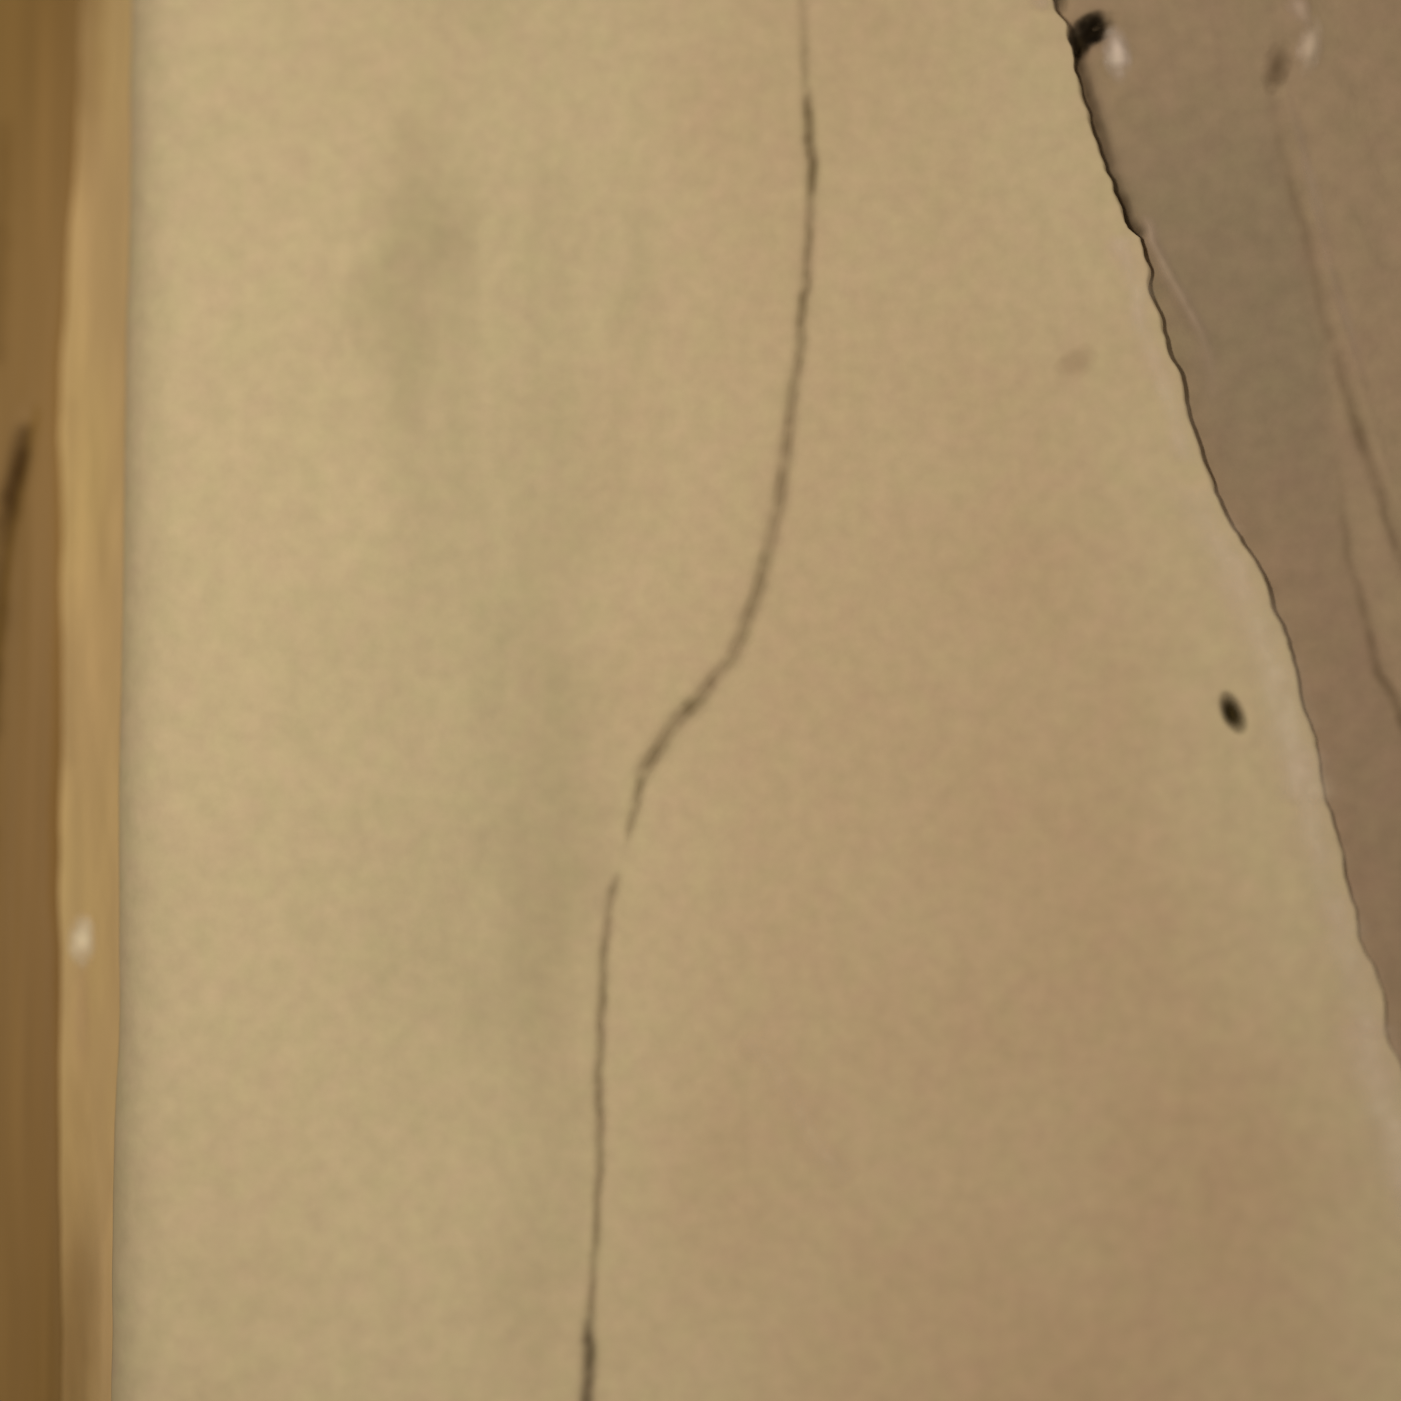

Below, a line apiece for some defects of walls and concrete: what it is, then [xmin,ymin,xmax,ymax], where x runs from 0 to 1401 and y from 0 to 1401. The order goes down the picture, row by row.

flaking render [1053,0,1401,1064]
crack [584,1334,592,1401]